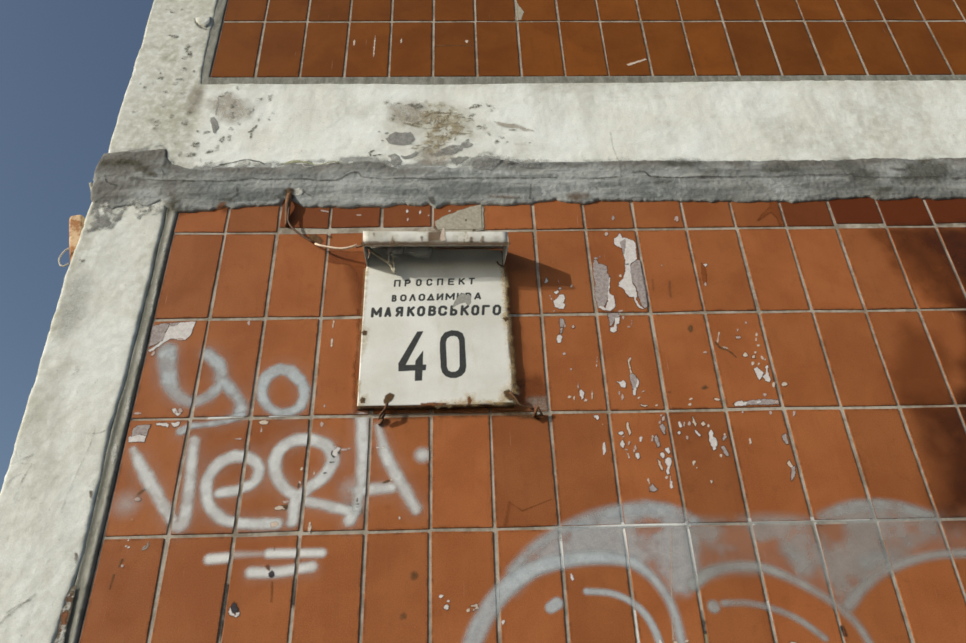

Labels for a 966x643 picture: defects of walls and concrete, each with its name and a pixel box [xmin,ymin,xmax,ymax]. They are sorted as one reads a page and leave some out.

spalling [188,117,229,163]
crack [103,125,556,201]
crack [599,170,742,178]
spalling [406,205,484,232]
peeling [593,232,648,333]
peeling [148,321,197,356]
peeling [734,333,788,415]
peeling [617,357,729,488]